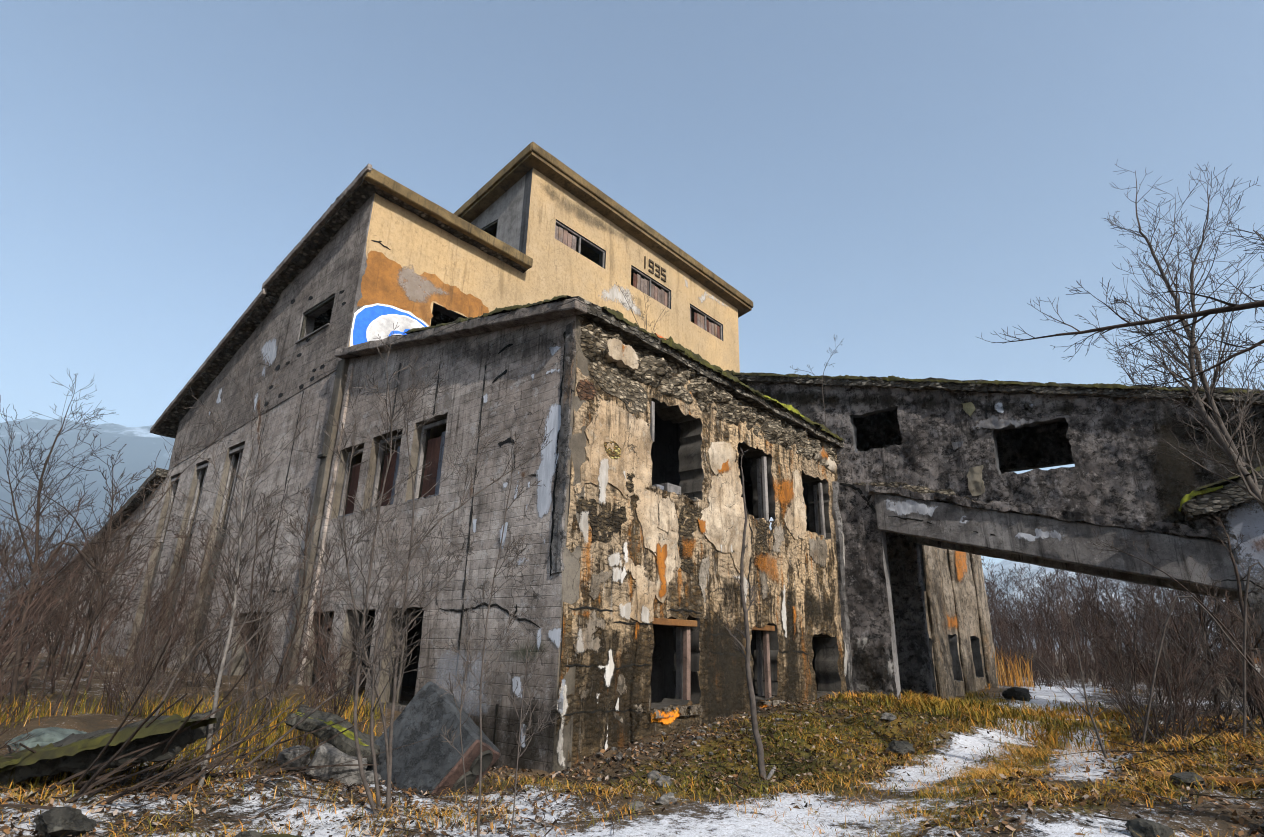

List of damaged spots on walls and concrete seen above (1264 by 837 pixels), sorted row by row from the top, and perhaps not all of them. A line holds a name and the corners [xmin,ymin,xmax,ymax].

peeling [339,251,489,326]
peeling [571,338,807,654]
peeling [1225,500,1264,580]
peeling [613,673,644,724]